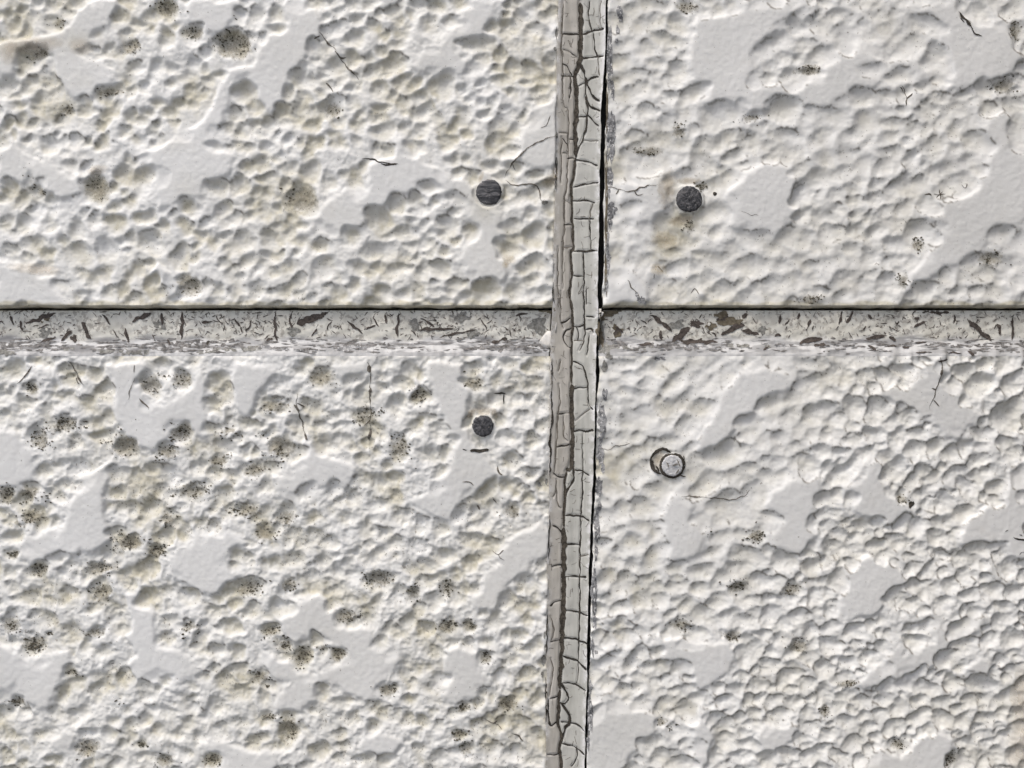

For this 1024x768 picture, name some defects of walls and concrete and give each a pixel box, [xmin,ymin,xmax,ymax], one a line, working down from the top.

spalling [9,313,91,351]
spalling [100,312,185,356]
peeling [196,311,332,354]
peeling [347,310,507,350]
peeling [595,292,826,372]
spalling [969,317,1014,341]
crack [505,0,749,768]
mould [27,417,88,451]
mould [0,482,58,527]
mould [87,529,170,605]
mould [6,616,53,656]
mould [261,625,345,671]